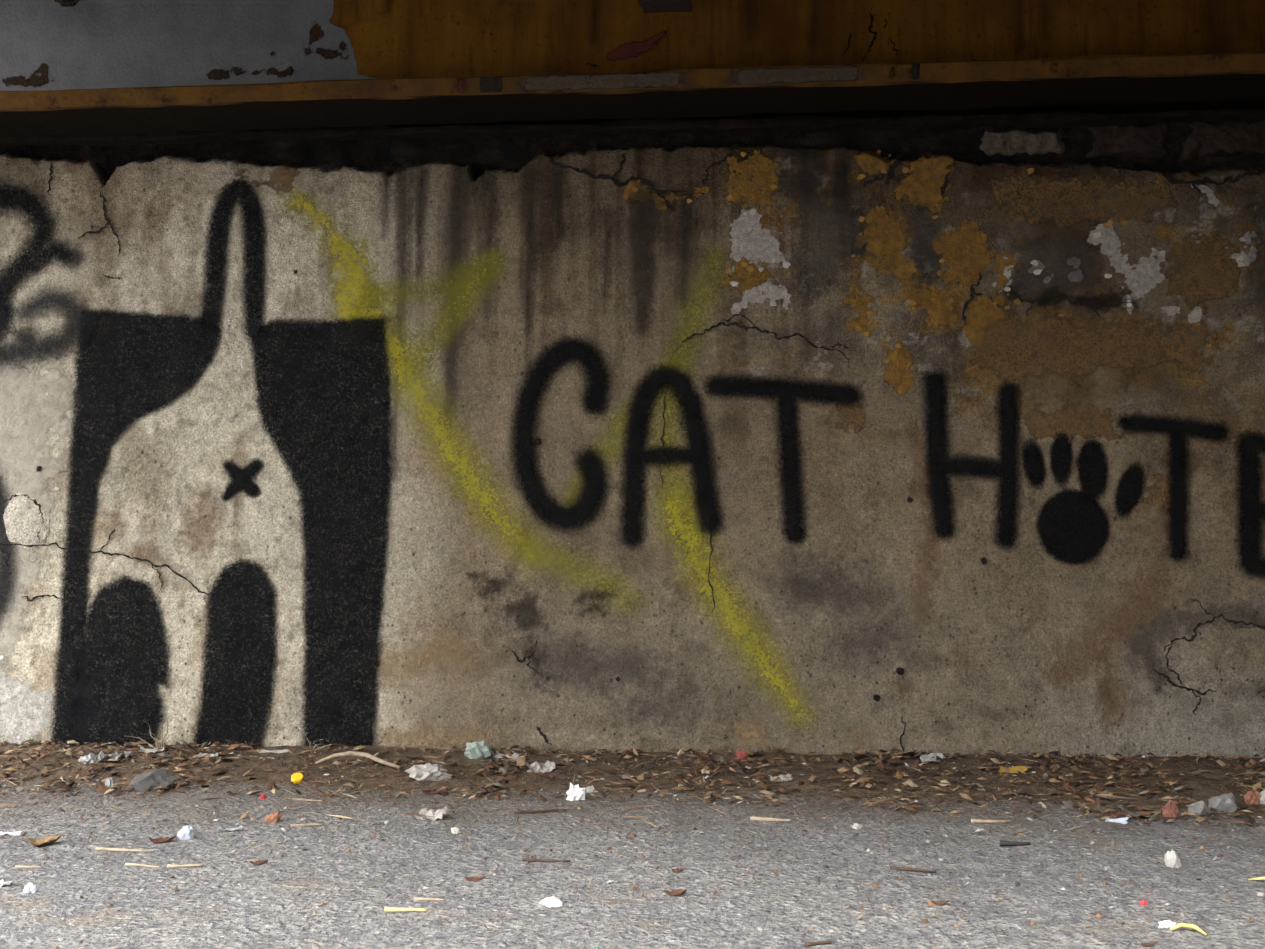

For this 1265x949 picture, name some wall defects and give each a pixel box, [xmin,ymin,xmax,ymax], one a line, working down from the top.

rust [2,63,53,87]
rust [207,52,293,80]
rust [304,21,349,59]
spalling [979,129,1066,156]
water stain [384,163,426,450]
water stain [446,164,495,405]
water stain [630,188,655,332]
peeling [851,150,1084,357]
peeling [1086,224,1166,315]
crack [0,494,224,595]
crack [21,594,64,602]
crack [1152,599,1265,715]